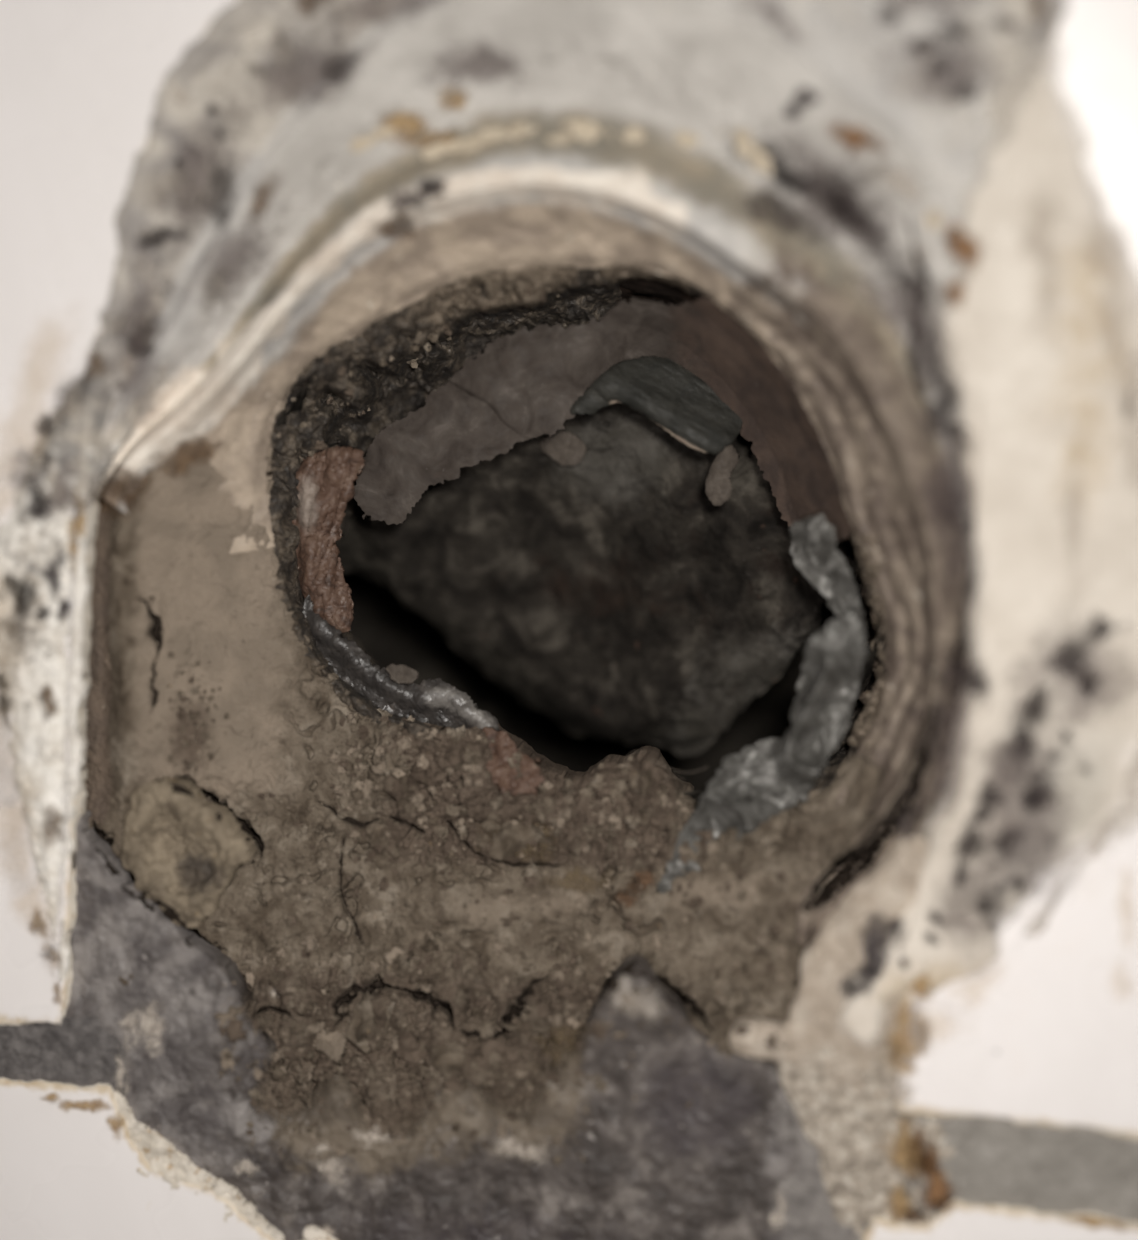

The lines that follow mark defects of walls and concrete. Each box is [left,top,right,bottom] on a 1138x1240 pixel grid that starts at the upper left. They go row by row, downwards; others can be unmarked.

water stain [785,88,820,119]
water stain [250,183,273,219]
water stain [379,178,445,237]
water stain [729,140,892,255]
water stain [0,287,167,981]
crack [317,801,563,944]
crack [252,1006,294,1018]
crack [333,975,549,1042]
spalling [729,830,955,1240]
spalling [113,1091,285,1240]
rust [889,1123,953,1224]
spalling [303,1225,338,1240]